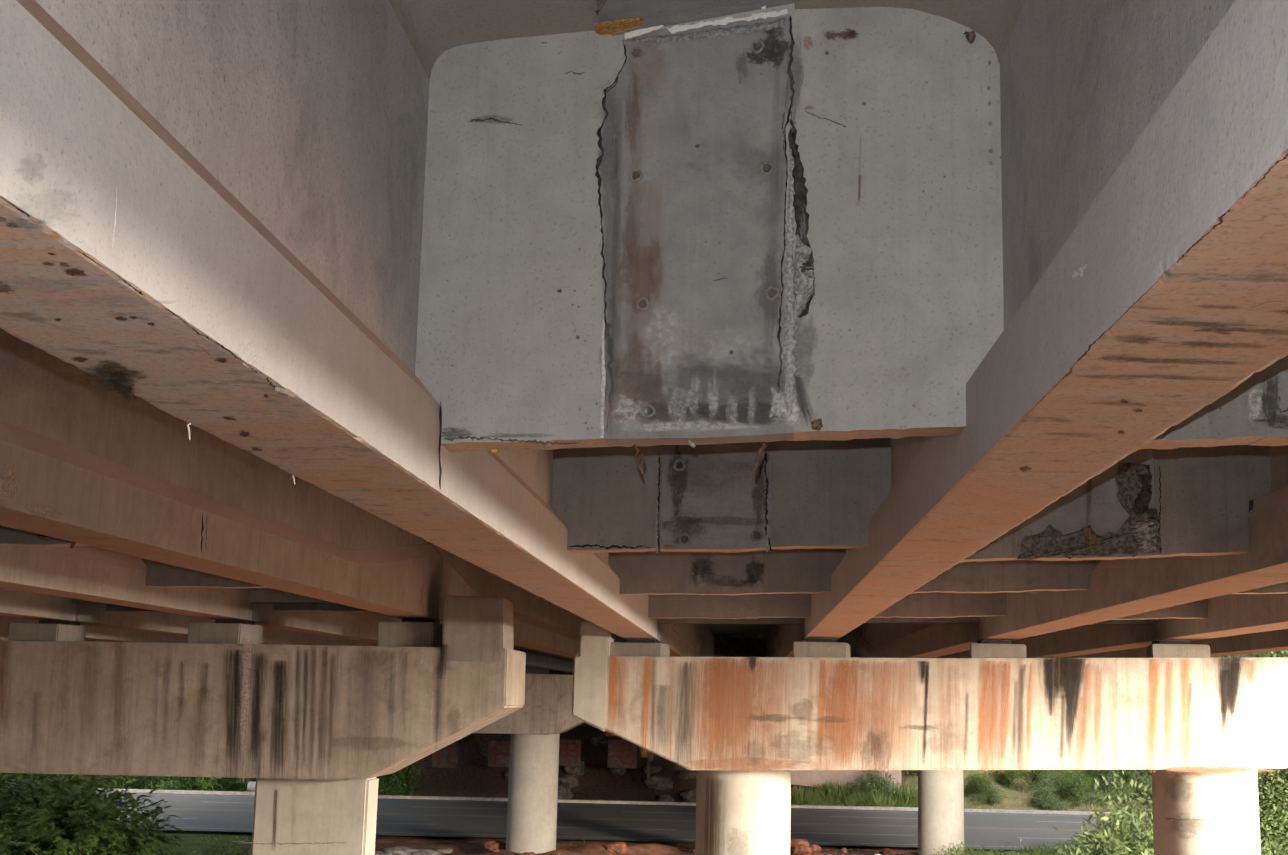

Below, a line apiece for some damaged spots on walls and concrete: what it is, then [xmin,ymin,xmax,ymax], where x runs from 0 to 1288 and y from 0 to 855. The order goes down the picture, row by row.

rust [595,18,644,35]
peeling [624,6,788,39]
rust [827,29,856,40]
spalling [788,111,816,318]
crack [439,45,627,490]
leakage [698,376,810,425]
spalling [1017,462,1162,560]
leakage [227,640,326,779]
rust [609,656,619,718]
leakage [1045,657,1084,753]
rust [1150,660,1191,756]
leakage [1220,657,1245,723]